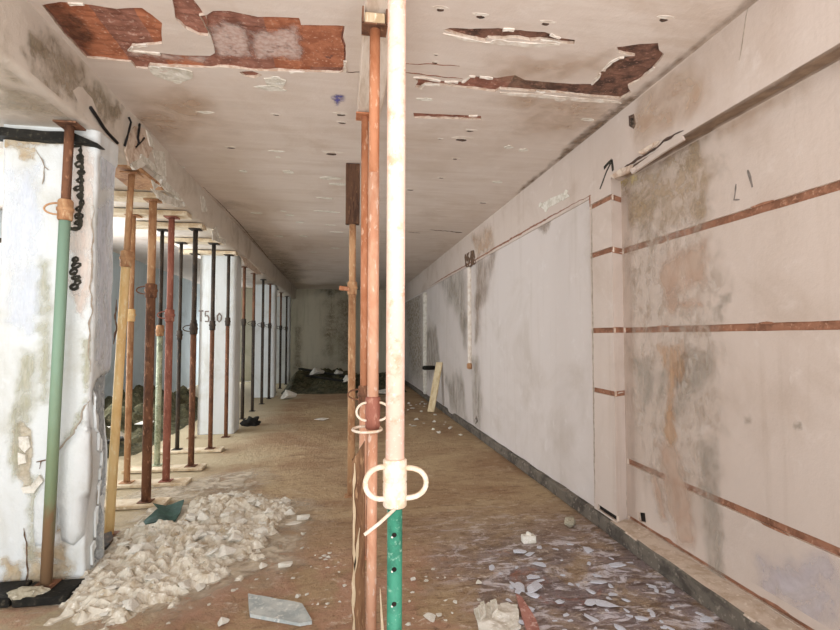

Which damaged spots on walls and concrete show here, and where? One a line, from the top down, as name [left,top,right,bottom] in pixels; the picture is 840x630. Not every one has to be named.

leakage [30,33,120,121]
flaking render [44,0,347,91]
flaking render [443,13,574,48]
flaking render [413,43,663,104]
leakage [4,139,47,160]
leakage [9,263,50,474]
flaking render [90,372,109,565]
leakage [2,493,41,583]
leakage [53,546,70,580]